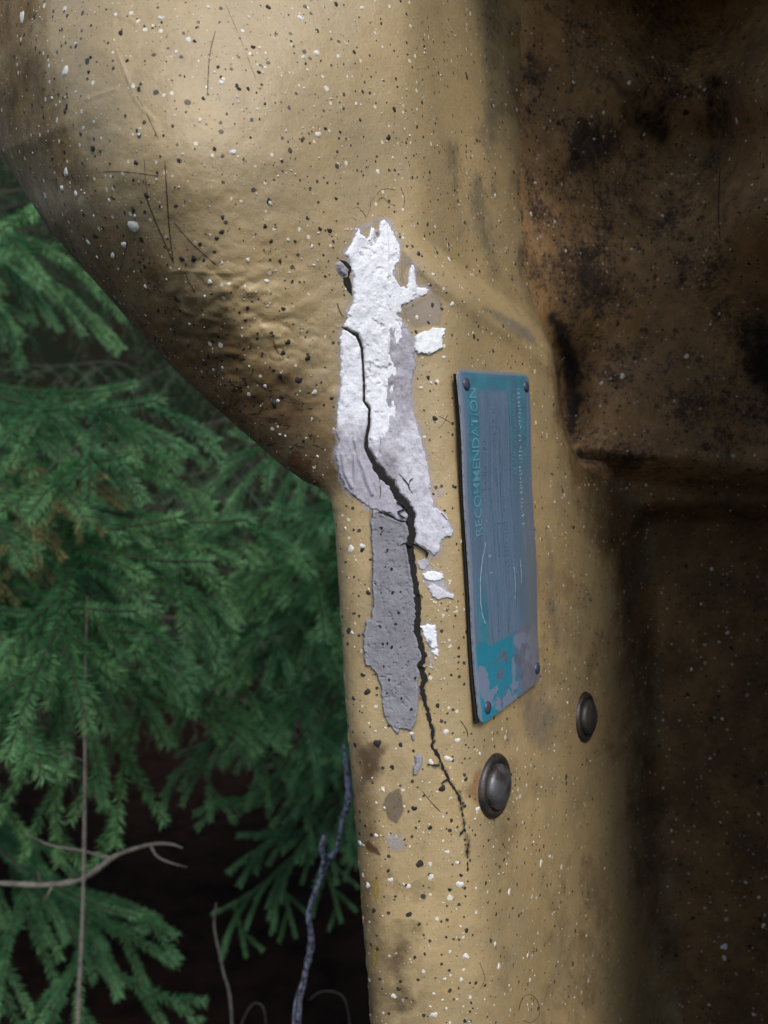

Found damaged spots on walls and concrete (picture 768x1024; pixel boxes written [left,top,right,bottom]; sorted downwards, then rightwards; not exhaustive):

spalling [334,220,454,600]
damp [549,312,582,434]
crack [341,326,470,882]
peeling [420,624,439,656]